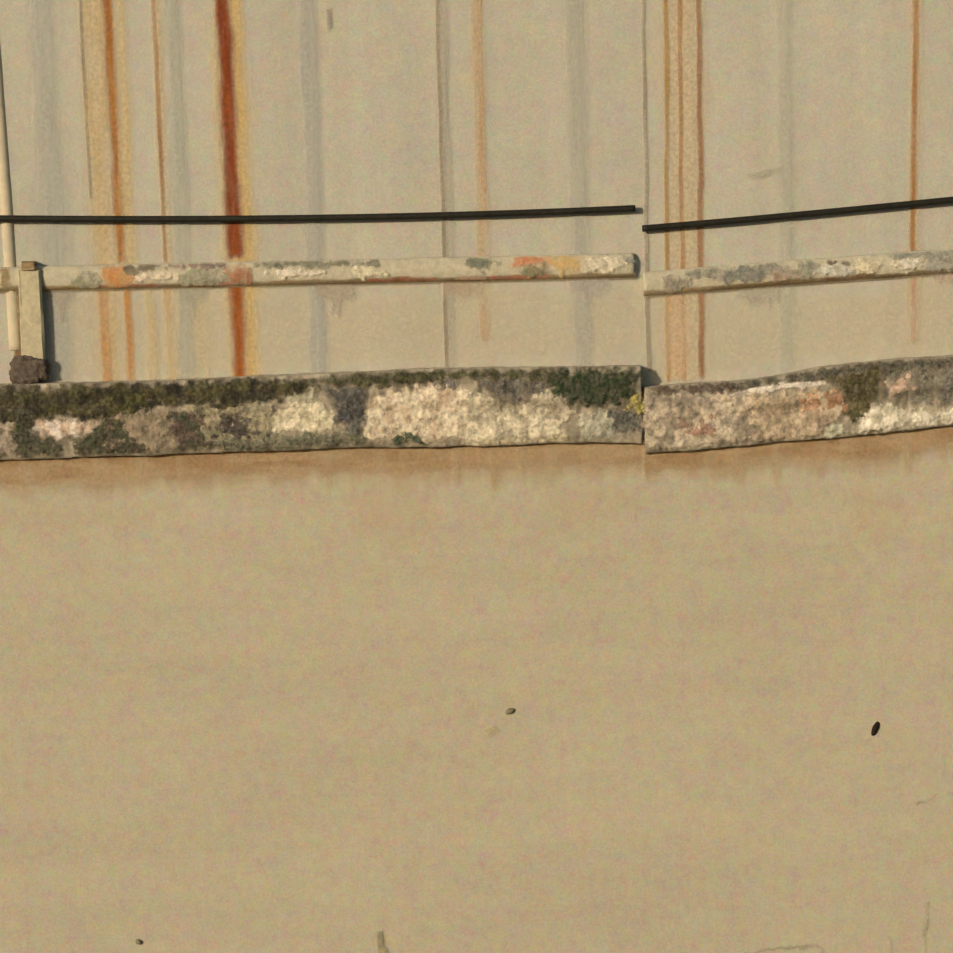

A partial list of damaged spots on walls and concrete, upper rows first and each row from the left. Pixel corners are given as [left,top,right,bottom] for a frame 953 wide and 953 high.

rust [0,268,21,356]
rust [42,0,649,381]
water stain [0,401,953,489]
rust [663,0,704,270]
rust [644,268,953,381]
rust [909,0,921,251]